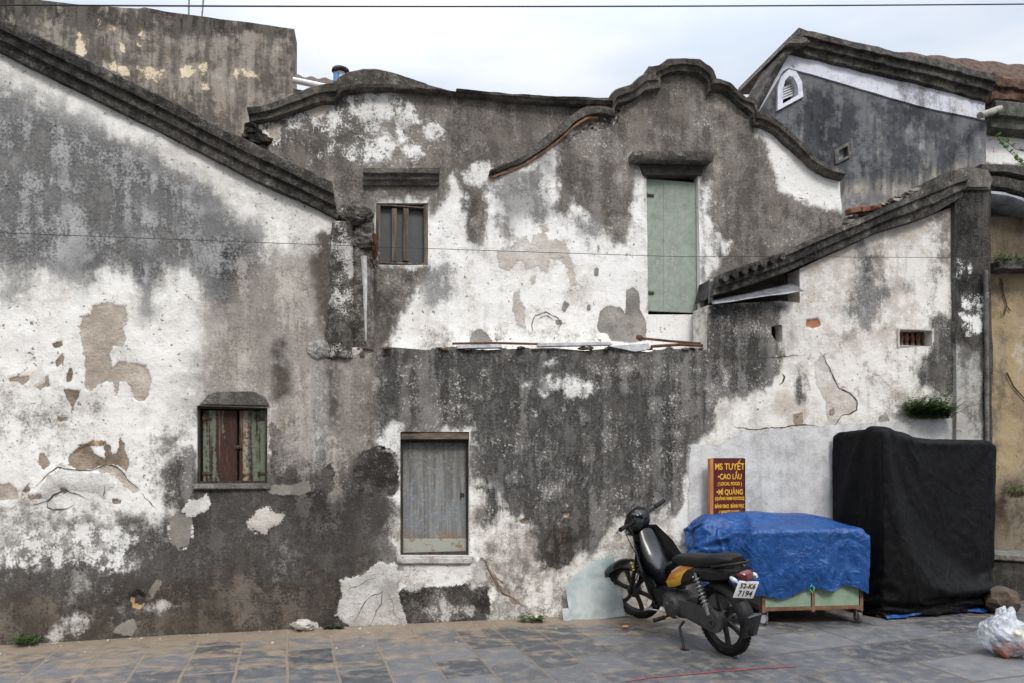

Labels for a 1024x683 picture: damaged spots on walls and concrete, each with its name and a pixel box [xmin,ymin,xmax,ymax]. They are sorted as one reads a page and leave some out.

peeling [75,32,87,57]
peeling [98,19,166,83]
peeling [180,62,210,90]
spalling [587,287,646,343]
flaking render [806,318,821,328]
spalling [8,302,152,422]
water stain [0,75,842,645]
crack [715,355,797,385]
crack [737,423,816,431]
spalling [0,482,42,501]
crack [29,464,154,510]
spalling [68,437,138,492]